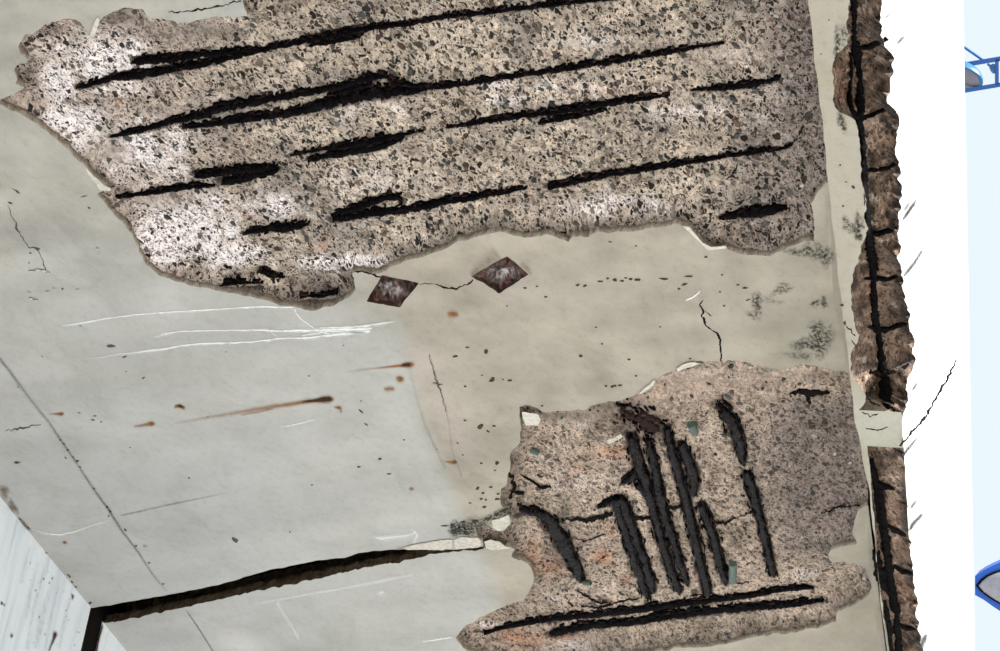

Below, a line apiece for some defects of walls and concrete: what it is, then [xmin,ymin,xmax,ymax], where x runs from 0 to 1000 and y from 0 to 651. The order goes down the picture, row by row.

spalling [0,0,828,311]
crack [8,188,46,270]
crack [351,270,381,287]
crack [420,279,473,290]
damp [63,306,390,354]
spalling [441,0,923,651]
crack [699,300,722,361]
rust [264,397,341,409]
crack [862,358,957,446]